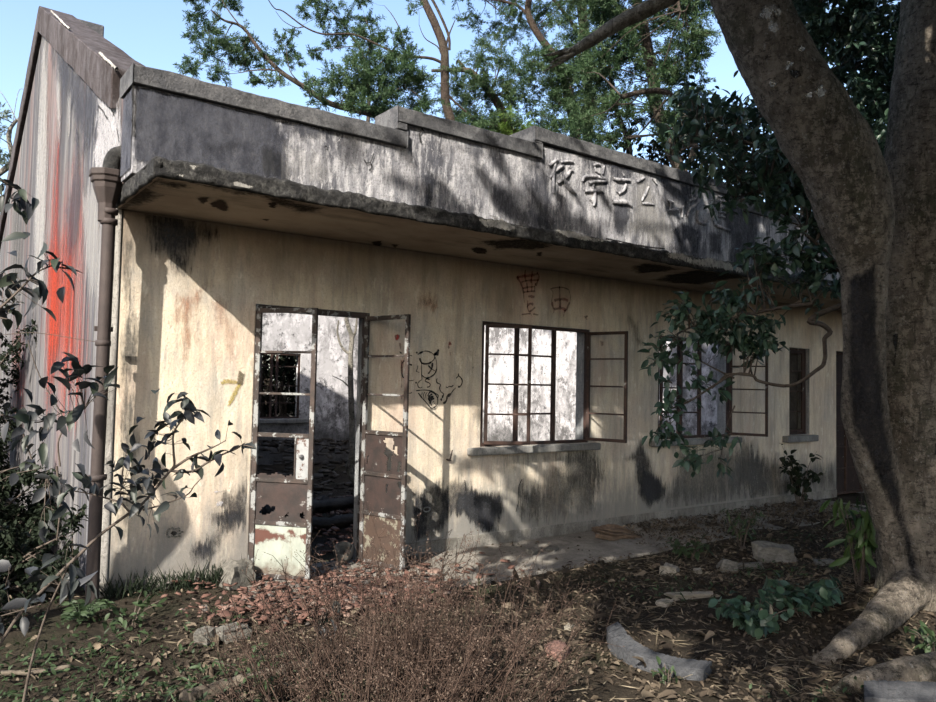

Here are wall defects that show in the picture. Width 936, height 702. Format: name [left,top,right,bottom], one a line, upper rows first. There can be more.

damp [119,181,186,209]
damp [146,215,217,271]
damp [423,170,435,206]
damp [611,164,633,178]
damp [614,177,699,257]
damp [710,200,759,264]
damp [634,263,742,285]
damp [629,443,790,506]
damp [195,483,247,559]
damp [414,482,502,539]